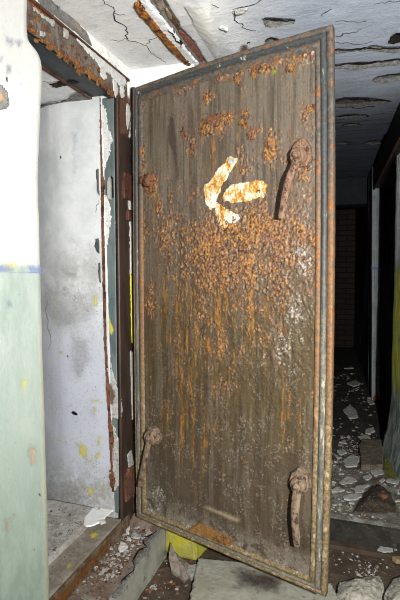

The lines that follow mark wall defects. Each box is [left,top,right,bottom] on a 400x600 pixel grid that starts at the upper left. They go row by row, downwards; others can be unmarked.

crack [103,0,164,62]
crack [212,0,260,31]
spalling [262,17,295,28]
spalling [0,77,9,110]
rust [29,15,131,134]
rust [179,111,258,151]
spalling [335,97,392,126]
spalling [335,33,400,83]
peeling [94,96,116,253]
rust [99,98,116,492]
spalling [112,529,161,598]